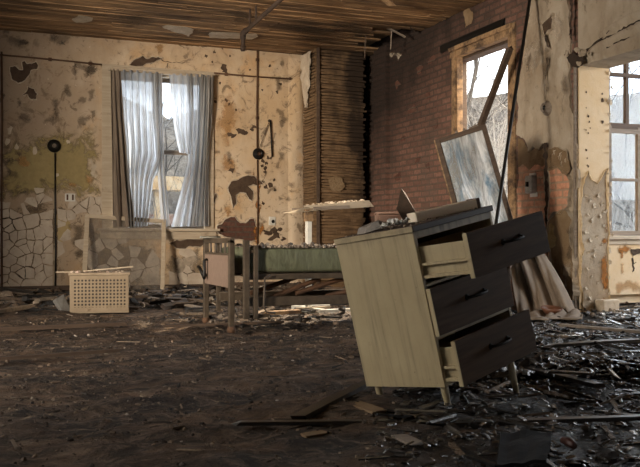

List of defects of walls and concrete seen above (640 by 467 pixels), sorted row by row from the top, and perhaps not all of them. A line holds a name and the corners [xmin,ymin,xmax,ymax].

crack [586,20,640,51]
flaking render [129,56,163,67]
flaking render [9,61,39,101]
peeling [227,125,256,138]
flaking render [227,156,276,208]
flaking render [216,216,286,242]
peeling [517,138,613,312]